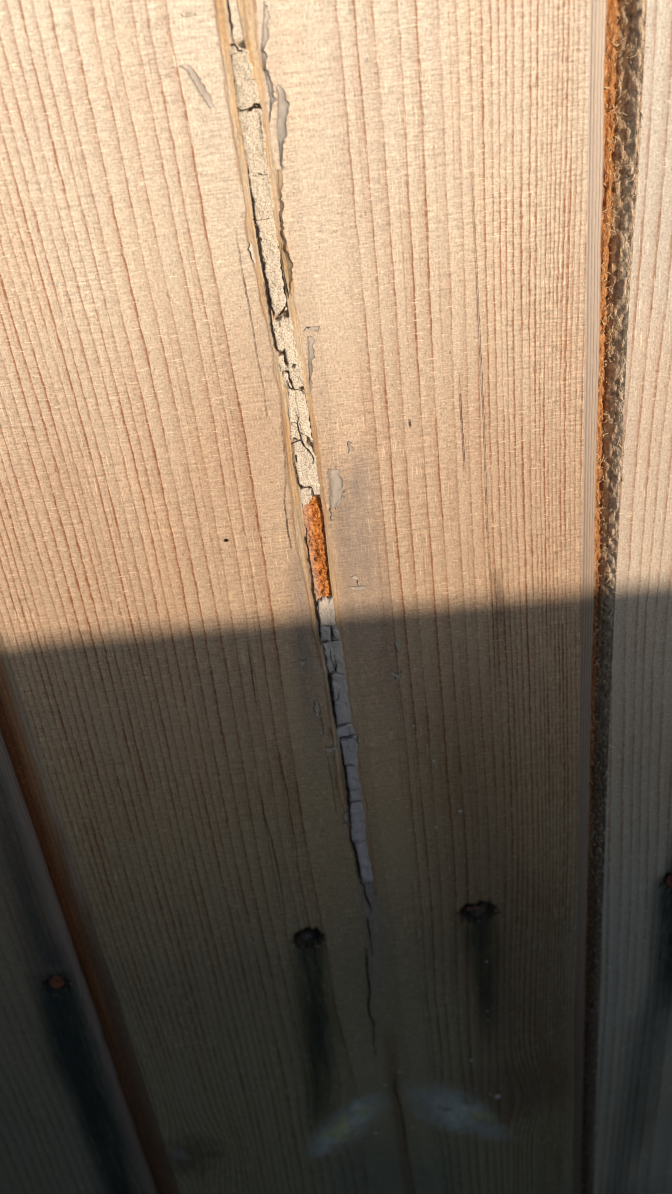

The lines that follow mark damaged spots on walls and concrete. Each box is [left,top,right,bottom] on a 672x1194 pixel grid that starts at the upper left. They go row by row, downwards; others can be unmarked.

crack [212,0,387,1054]
spalling [303,496,332,599]